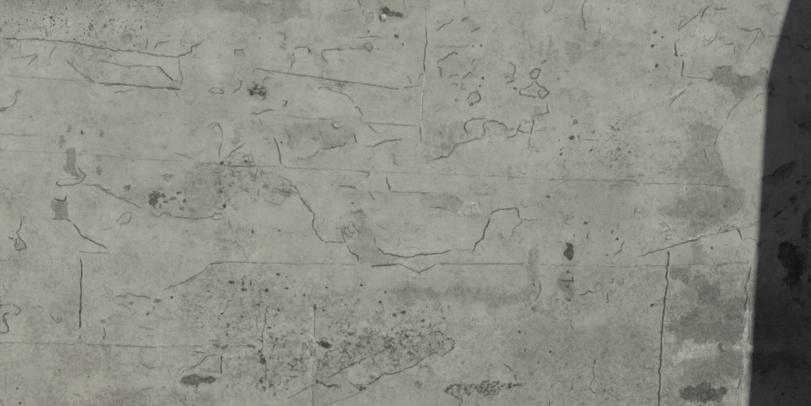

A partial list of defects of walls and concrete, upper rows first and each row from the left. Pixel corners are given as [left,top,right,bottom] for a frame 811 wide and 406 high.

crack [647,246,673,406]